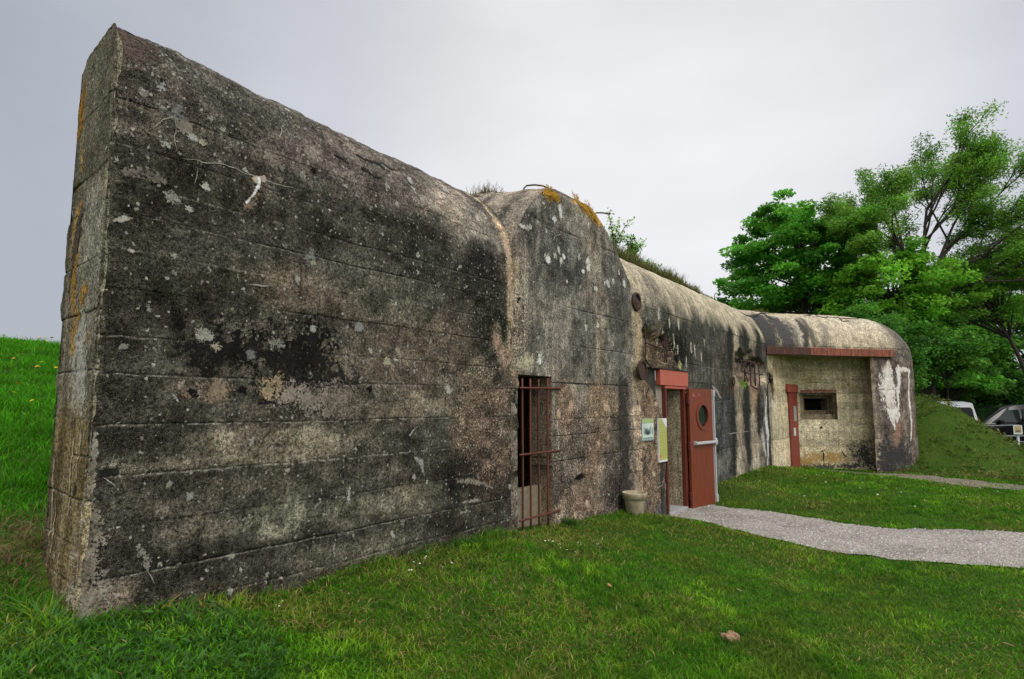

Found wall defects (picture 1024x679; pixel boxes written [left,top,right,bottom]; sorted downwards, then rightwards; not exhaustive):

crack [154,103,293,188]
mould [174,309,369,415]
leakage [731,383,774,477]
peeling [877,360,912,440]